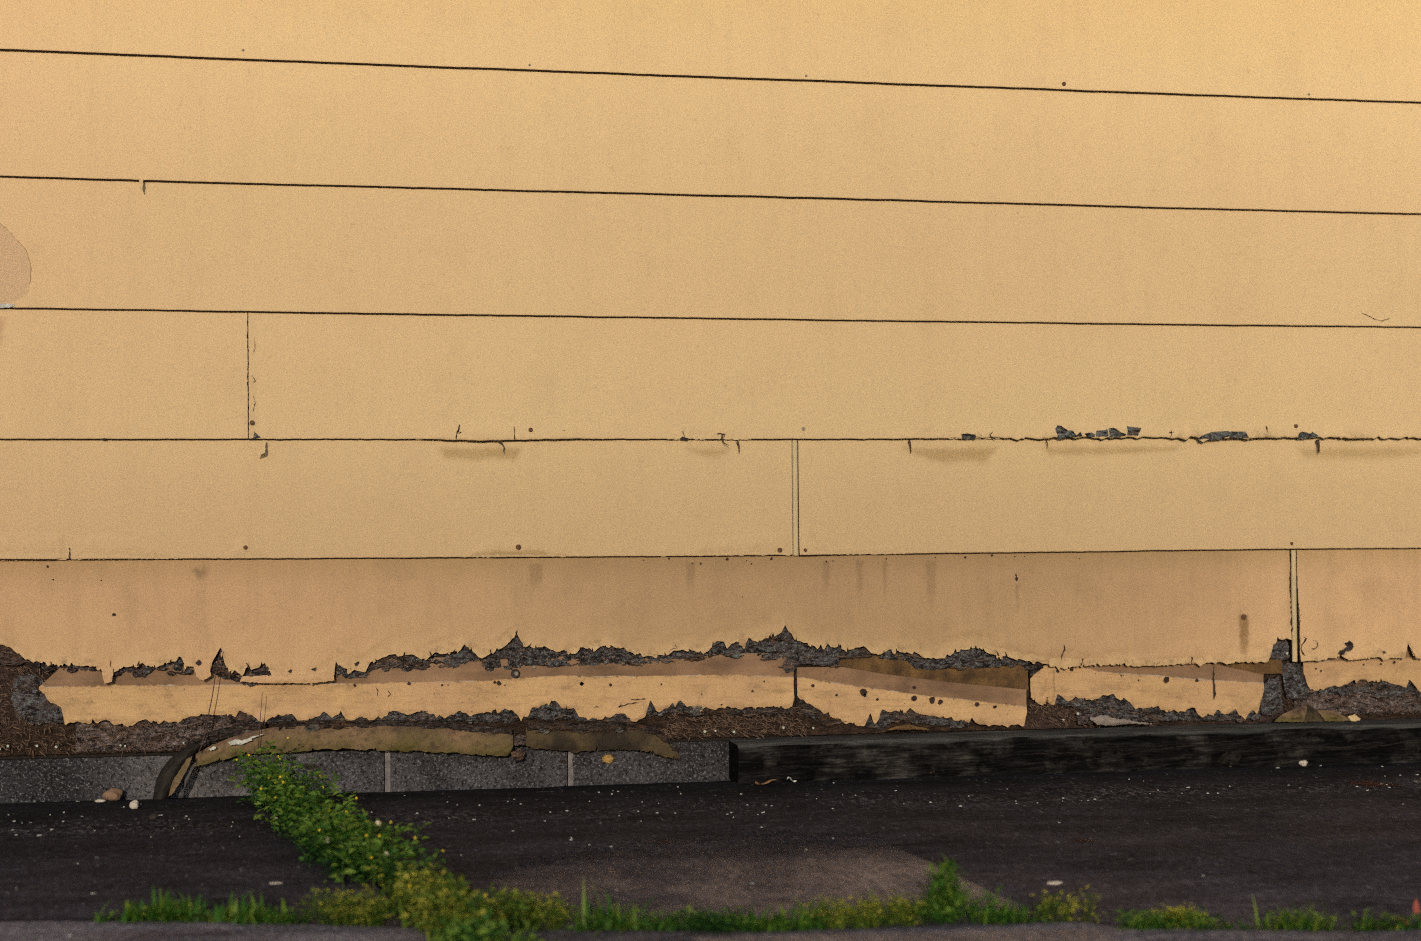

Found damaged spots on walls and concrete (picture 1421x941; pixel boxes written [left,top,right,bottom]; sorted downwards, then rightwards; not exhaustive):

peeling [1046,425,1141,448]
peeling [1197,431,1249,442]
peeling [1296,431,1320,453]
spalling [1056,638,1421,725]
peeling [0,626,1044,766]